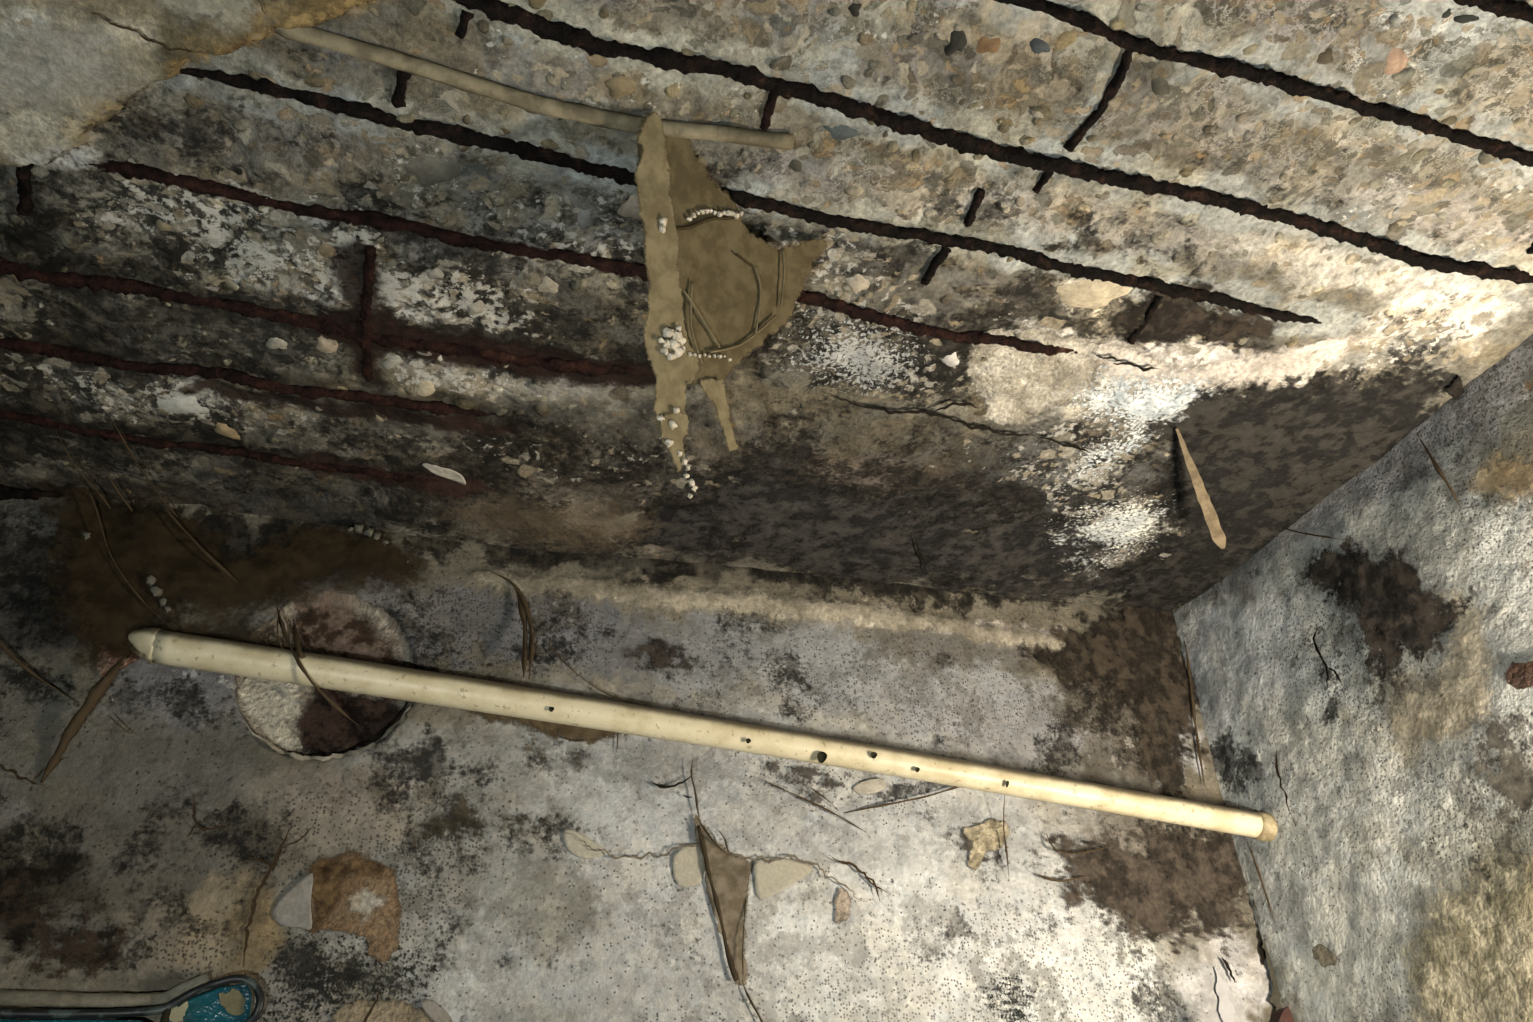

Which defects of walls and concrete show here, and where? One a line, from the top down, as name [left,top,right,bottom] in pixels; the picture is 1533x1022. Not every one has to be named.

crack [83,9,198,53]
spalling [0,0,1533,516]
rust [181,242,656,437]
rust [302,452,491,498]
leakage [495,281,1467,799]
leakage [765,761,851,812]
leakage [0,839,146,985]
peeling [272,851,402,963]
peeling [563,829,704,887]
peeling [724,847,877,924]
leakage [252,925,461,1022]
peeling [332,985,453,1022]